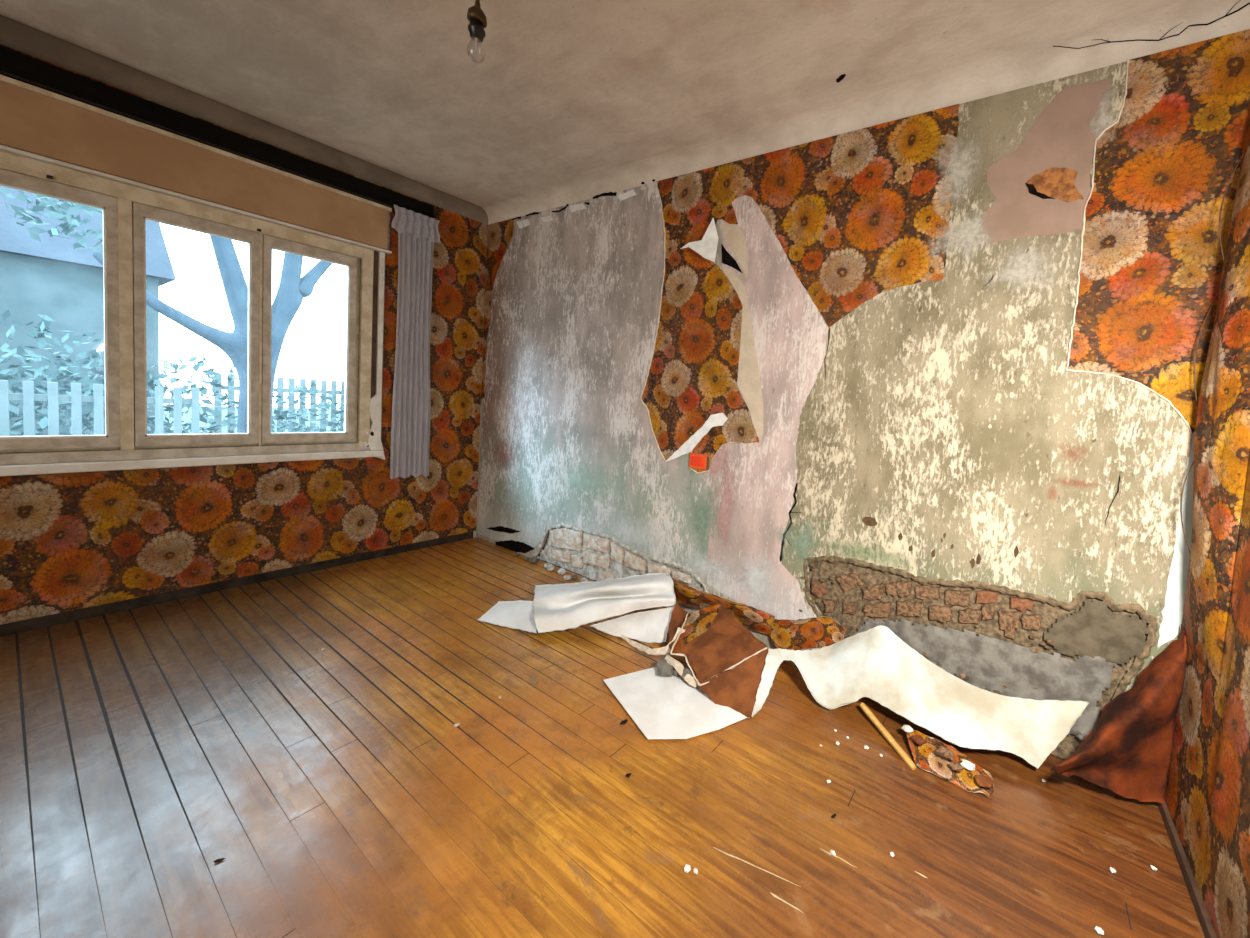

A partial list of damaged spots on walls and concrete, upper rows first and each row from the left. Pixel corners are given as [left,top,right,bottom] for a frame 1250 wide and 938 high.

peeling [478,61,1194,804]